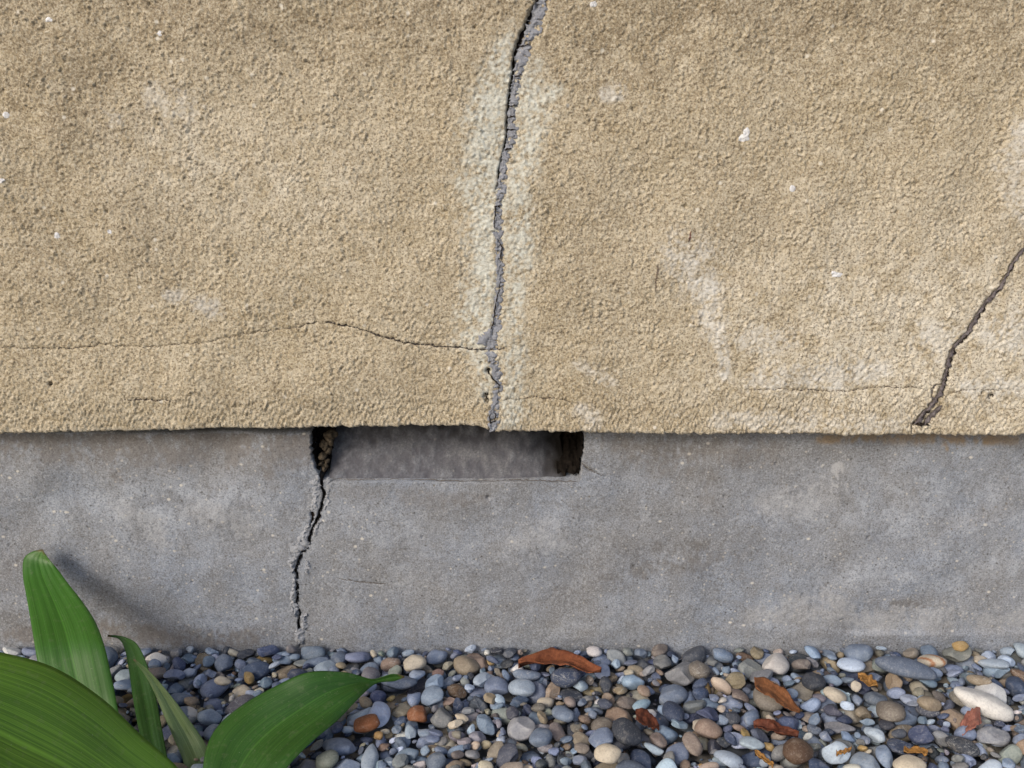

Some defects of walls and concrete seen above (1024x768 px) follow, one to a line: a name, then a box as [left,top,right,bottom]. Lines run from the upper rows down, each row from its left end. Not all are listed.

crack [1,0,569,432]
crack [747,248,1024,431]
crack [287,426,602,646]